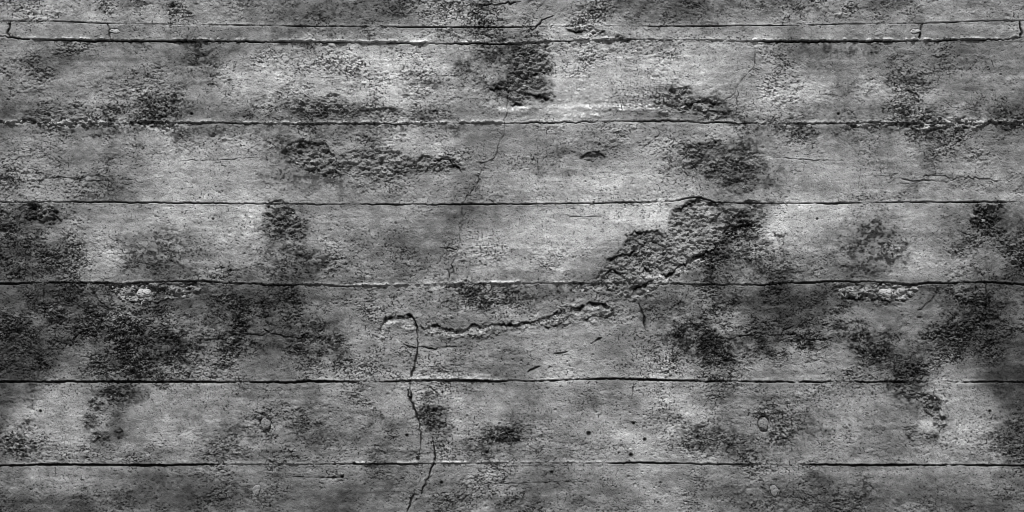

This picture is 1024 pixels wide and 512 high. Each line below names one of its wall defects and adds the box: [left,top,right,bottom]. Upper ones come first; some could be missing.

spalling [490,45,554,107]
spalling [571,142,766,302]
crack [406,302,611,511]